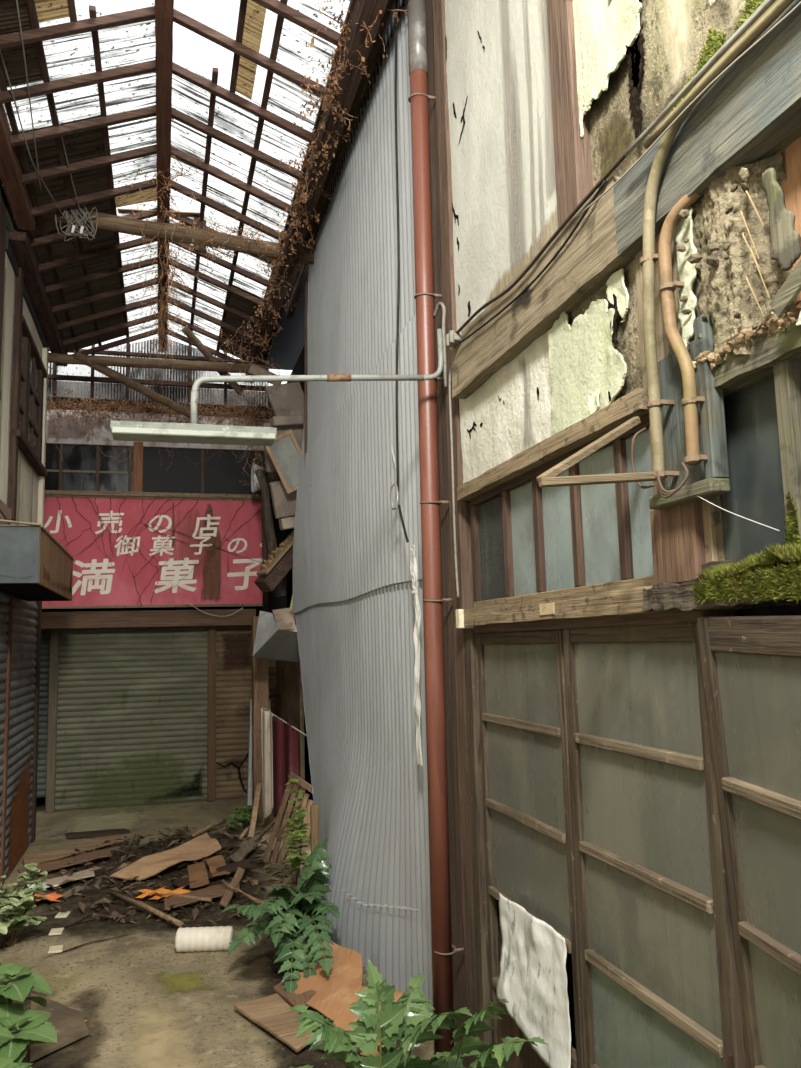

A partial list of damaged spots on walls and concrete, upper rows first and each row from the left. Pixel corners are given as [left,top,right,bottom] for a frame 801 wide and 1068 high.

flaking render [572,0,642,139]
crack [626,33,645,139]
damp [664,0,690,114]
flaking render [548,269,629,435]